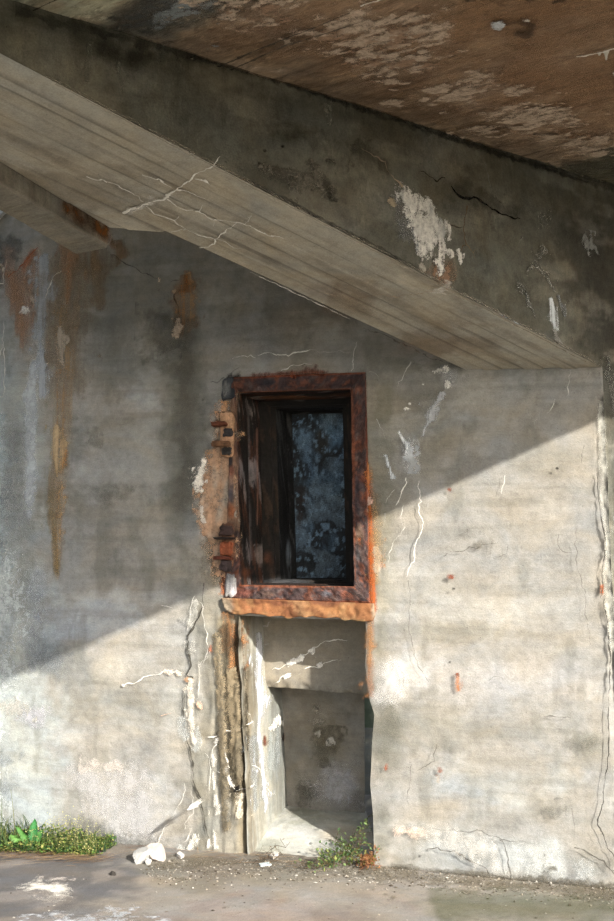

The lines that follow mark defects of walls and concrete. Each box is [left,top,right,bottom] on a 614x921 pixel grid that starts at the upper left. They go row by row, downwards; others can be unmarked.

damp [114,0,236,44]
damp [491,20,535,39]
corrosion [62,202,126,258]
crack [86,159,284,248]
peeling [426,259,455,287]
corrosion [45,424,68,573]
crack [387,478,424,575]
corrosion [221,612,249,680]
crack [272,639,345,683]
crack [574,477,614,873]
crack [121,584,254,843]
crack [429,839,512,880]